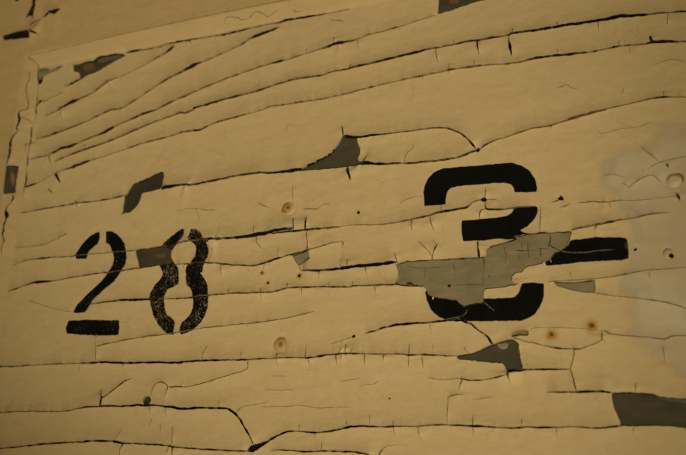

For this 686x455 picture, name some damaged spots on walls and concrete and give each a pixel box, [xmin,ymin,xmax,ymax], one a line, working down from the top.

peeling [438,0,484,14]
peeling [64,53,125,87]
peeling [289,137,368,172]
crack [1,0,686,312]
peeling [3,166,19,194]
peeling [122,171,164,215]
peeling [136,245,172,268]
peeling [395,231,572,307]
peeling [554,280,596,293]
peeling [457,330,529,372]
crack [0,310,686,455]
peeling [612,392,686,429]